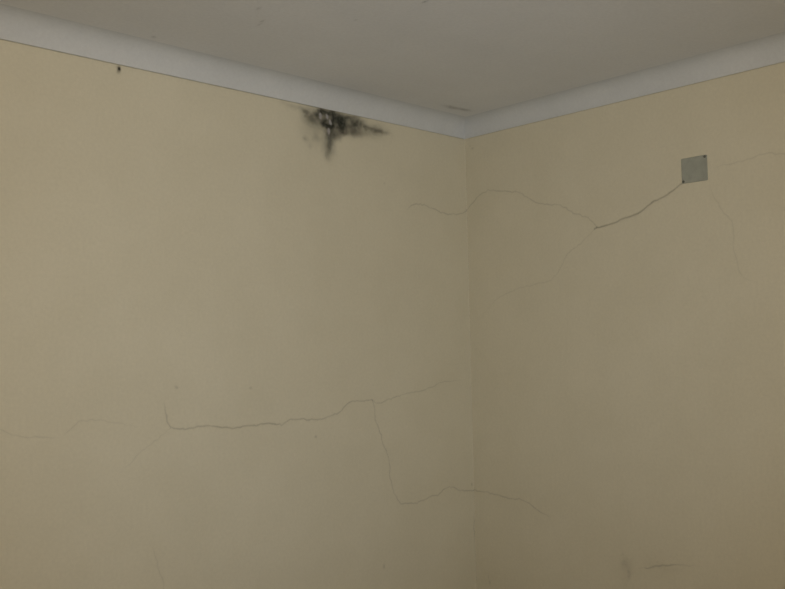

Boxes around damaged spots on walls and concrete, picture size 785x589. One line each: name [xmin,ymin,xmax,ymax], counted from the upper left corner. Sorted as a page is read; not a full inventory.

water stain [315,109,356,134]